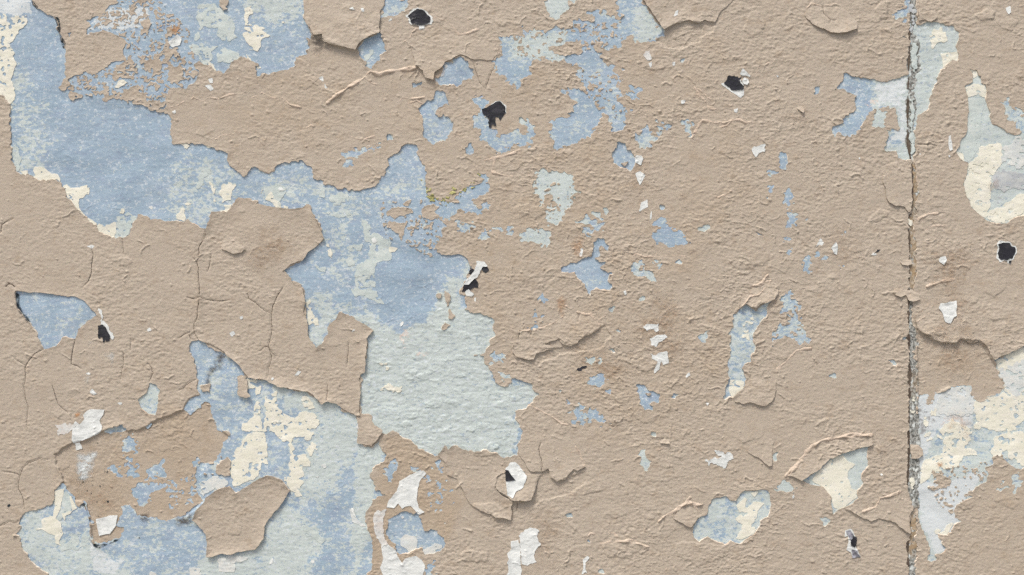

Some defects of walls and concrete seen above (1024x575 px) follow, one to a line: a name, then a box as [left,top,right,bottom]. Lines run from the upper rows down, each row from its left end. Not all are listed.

peeling [832,0,959,212]
peeling [956,69,1024,224]
peeling [0,0,695,575]
peeling [723,282,814,406]
crack [905,0,933,575]
peeling [673,347,1024,562]